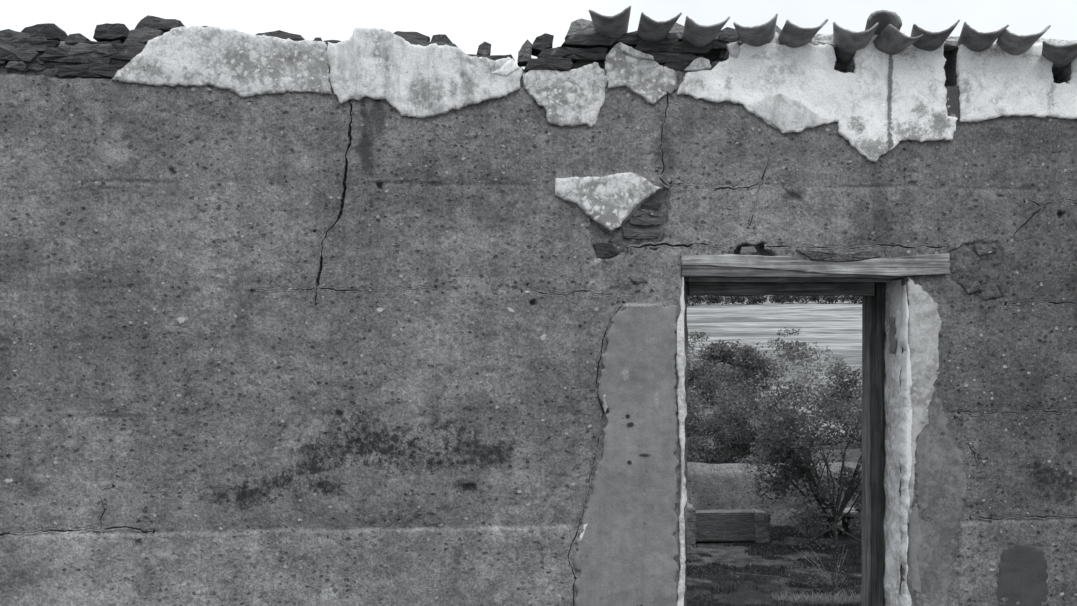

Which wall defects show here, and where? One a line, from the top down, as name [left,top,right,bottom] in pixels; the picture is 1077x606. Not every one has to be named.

crack [251,100,436,303]
peeling [555,172,668,258]
crack [627,241,731,251]
crack [655,94,948,252]
crack [1007,198,1077,242]
crack [0,485,153,538]
leakage [199,411,513,510]
peeling [574,302,679,606]
peeling [904,382,982,606]